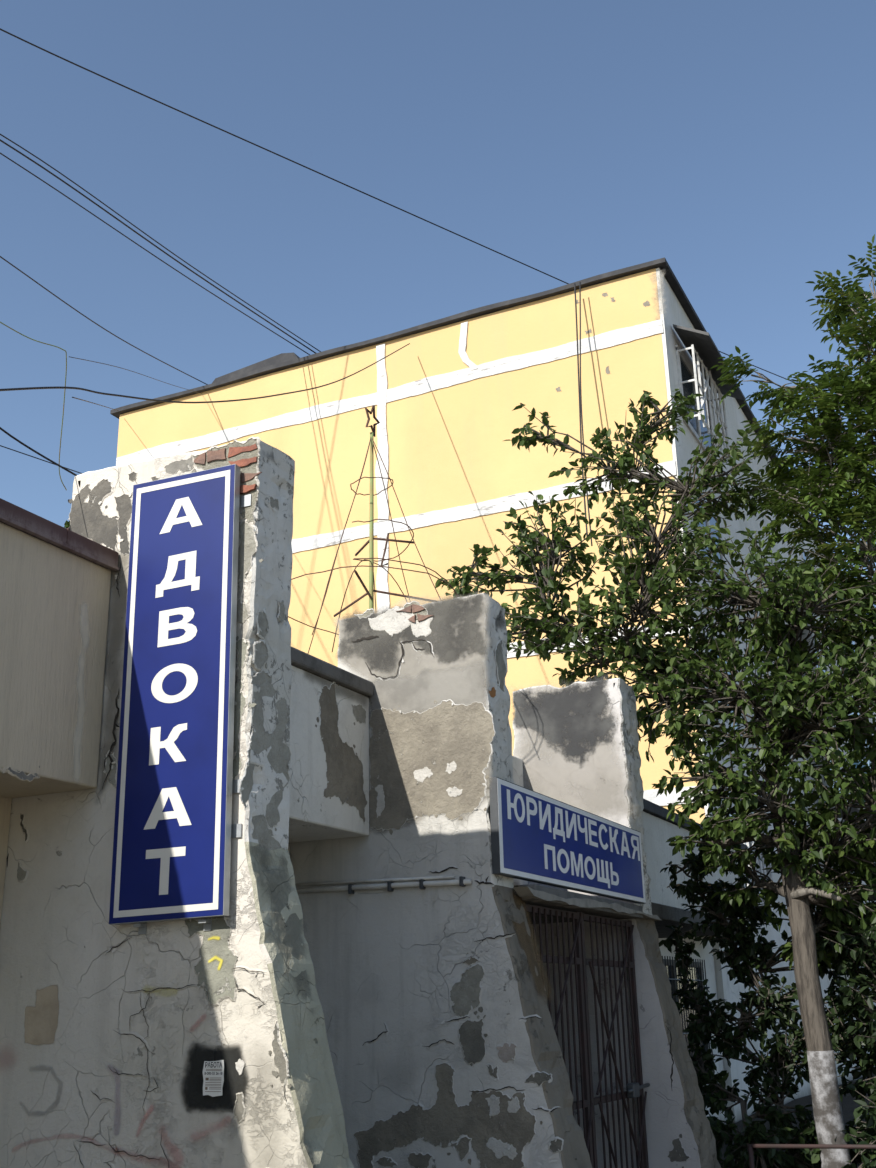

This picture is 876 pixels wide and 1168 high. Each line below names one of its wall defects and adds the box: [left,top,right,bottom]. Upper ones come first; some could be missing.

peeling [68,436,292,851]
flaking render [315,596,506,835]
leakage [513,676,615,763]
crack [106,936,134,955]
crack [474,933,516,944]
crack [233,966,267,1006]
crack [362,1022,390,1046]
crack [423,1015,471,1050]
crack [73,984,201,1168]
peeling [354,955,553,1168]
crack [468,1086,559,1113]
peeling [547,1137,564,1154]